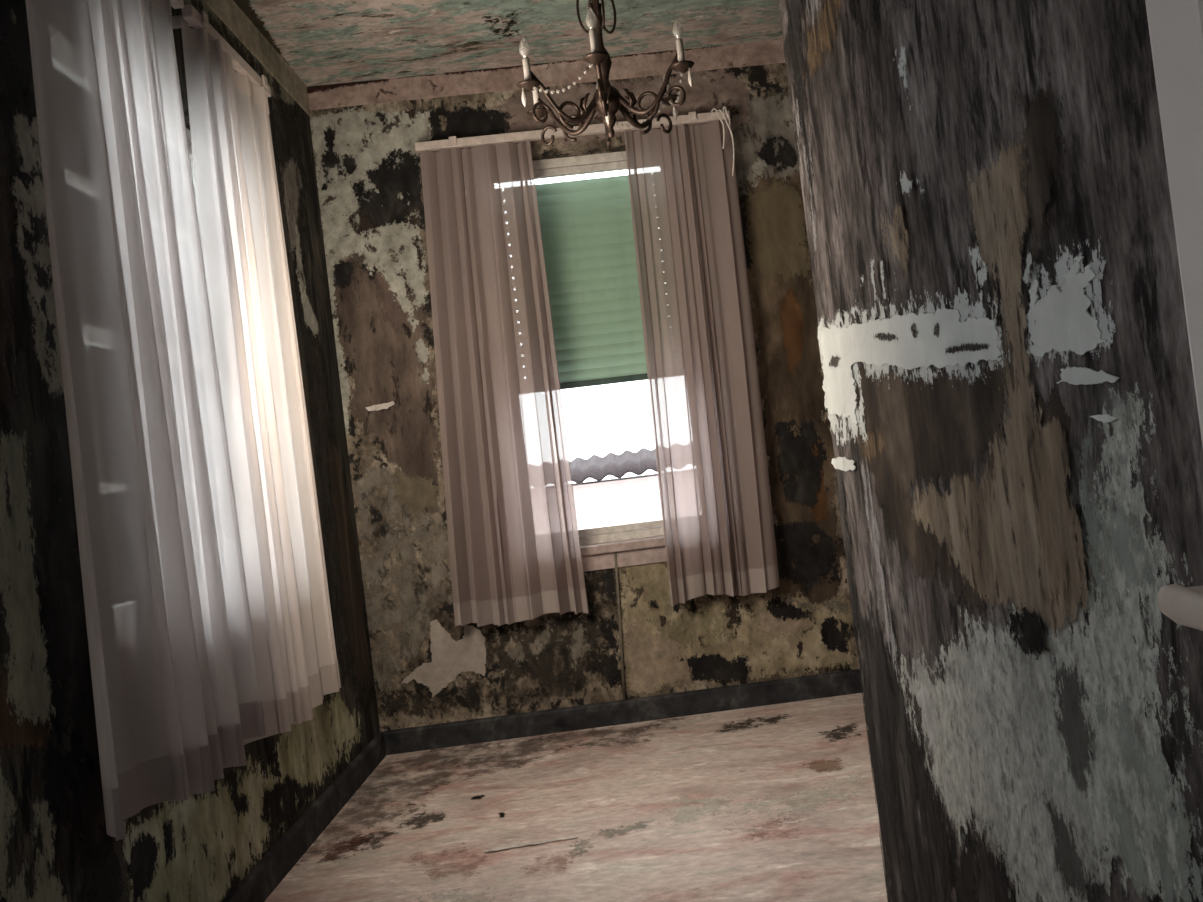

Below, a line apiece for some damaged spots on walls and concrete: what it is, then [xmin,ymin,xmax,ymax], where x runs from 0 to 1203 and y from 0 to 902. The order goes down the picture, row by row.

peeling [183,0,295,107]
peeling [7,109,64,398]
flaking render [310,107,443,497]
peeling [817,246,1010,472]
peeling [1022,232,1119,385]
leakage [738,0,1203,902]
peeling [0,428,56,731]
leakage [648,599,698,628]
leakage [679,653,750,684]
leakage [723,595,742,630]
leakage [714,714,789,733]
leakage [598,821,651,837]